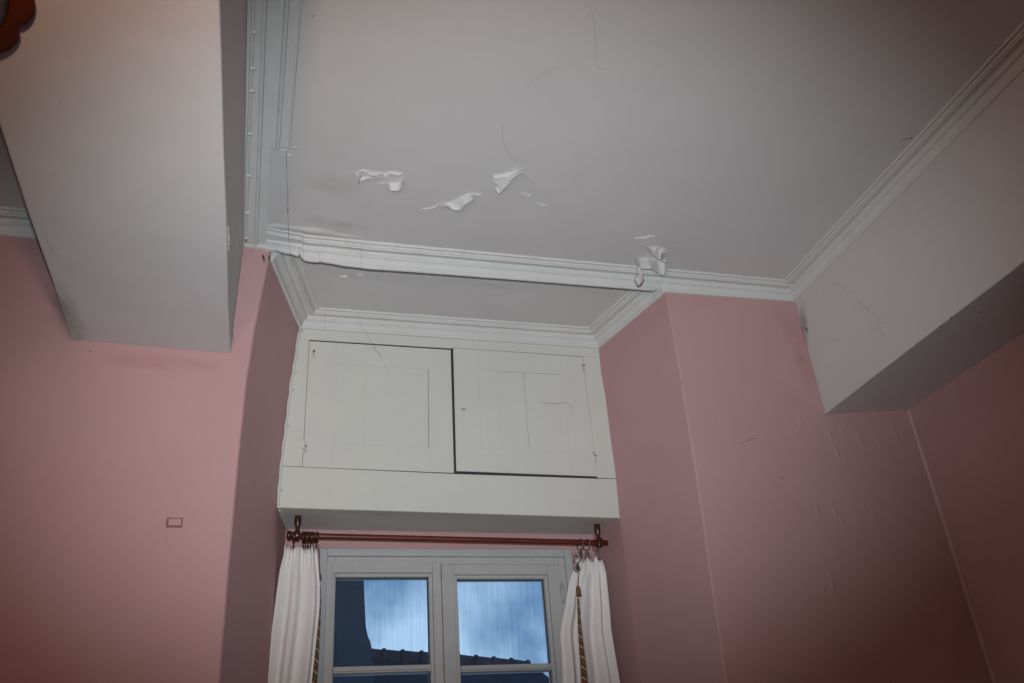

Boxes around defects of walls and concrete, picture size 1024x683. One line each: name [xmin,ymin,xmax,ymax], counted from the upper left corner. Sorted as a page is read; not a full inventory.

peeling [354,169,405,191]
peeling [492,170,529,194]
peeling [421,192,482,211]
peeling [275,235,667,292]